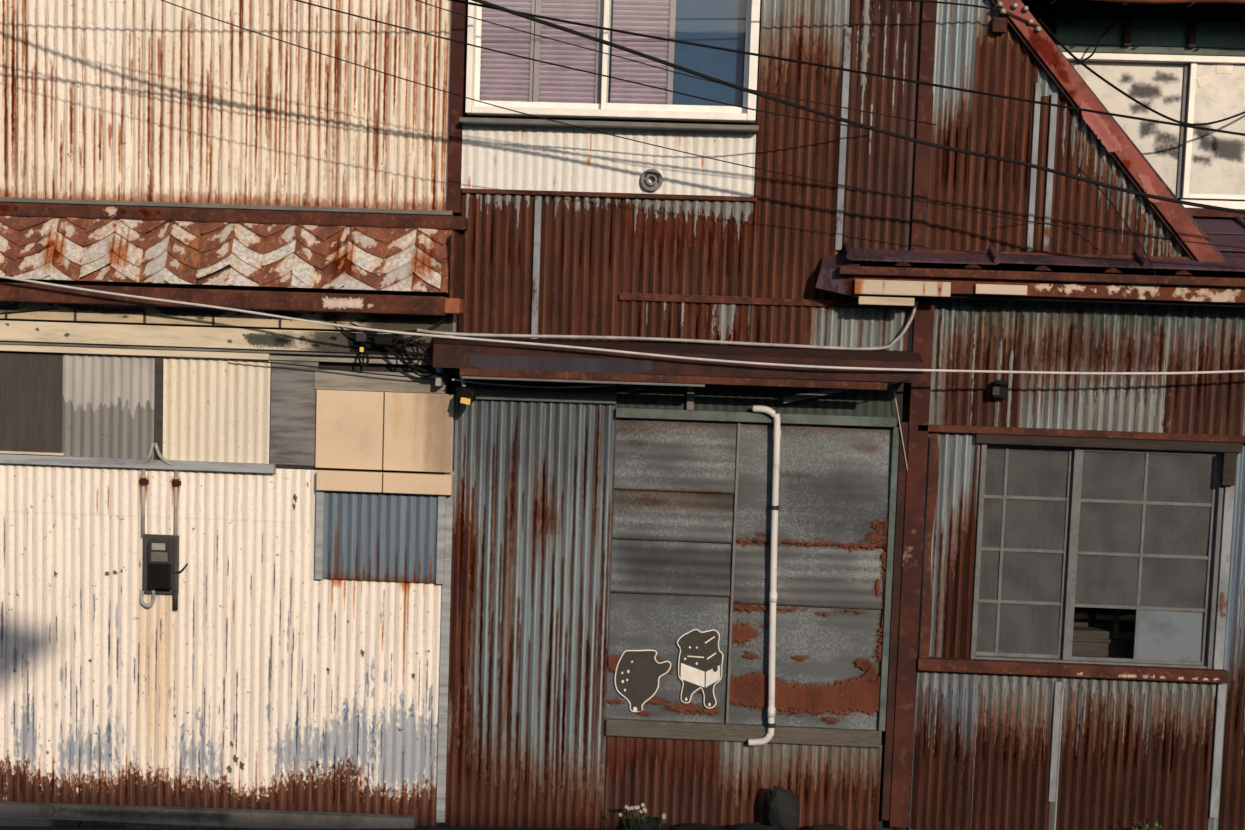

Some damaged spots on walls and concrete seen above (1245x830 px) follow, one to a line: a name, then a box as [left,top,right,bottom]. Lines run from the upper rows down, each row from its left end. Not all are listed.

corrosion [459,0,915,347]
corrosion [926,26,1171,257]
corrosion [943,315,1245,435]
corrosion [0,508,888,830]
corrosion [910,674,1245,830]